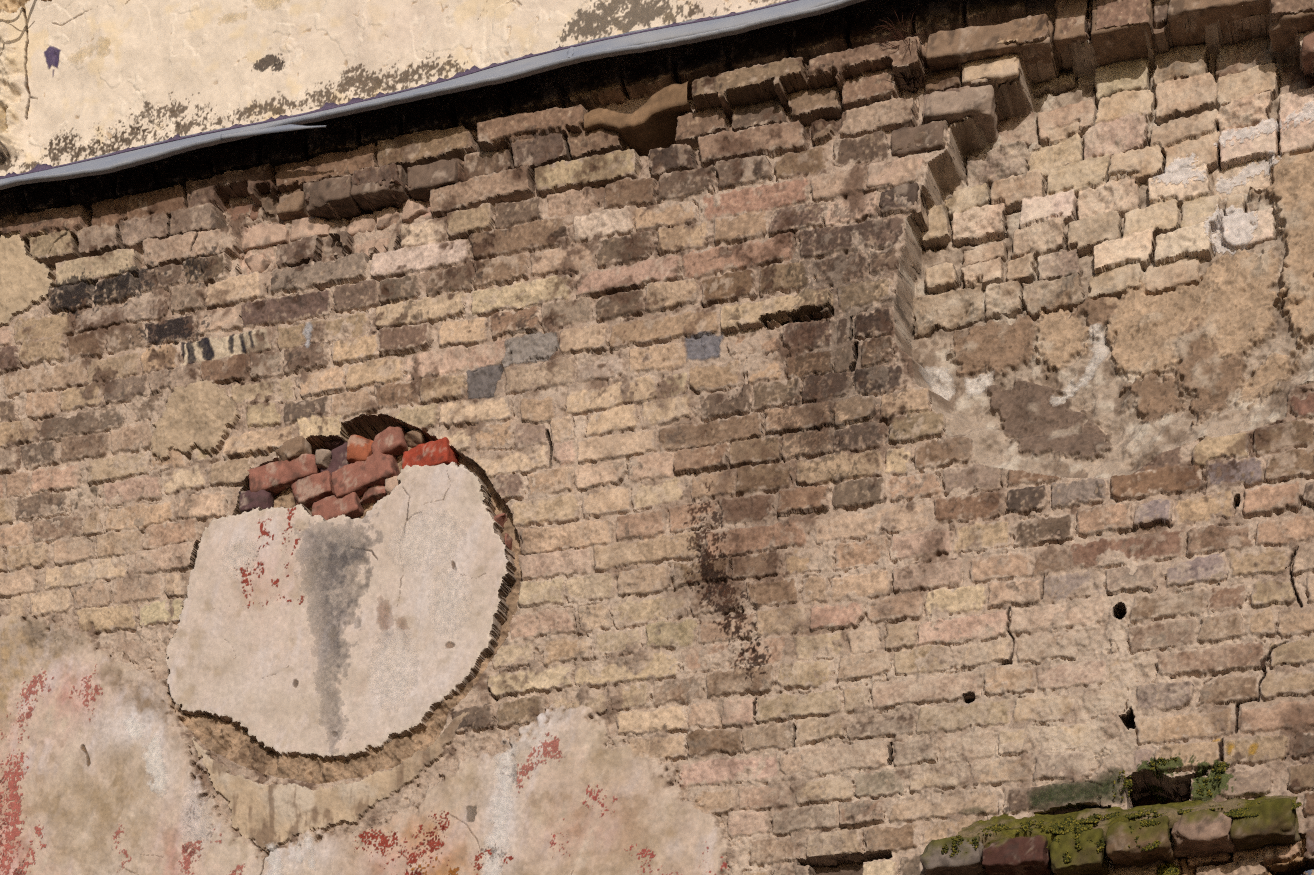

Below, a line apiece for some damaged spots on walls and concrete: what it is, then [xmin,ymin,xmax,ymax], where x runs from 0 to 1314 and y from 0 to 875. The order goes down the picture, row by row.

water stain [0,54,465,173]
spalling [219,177,434,275]
spalling [894,11,1314,478]
water stain [316,537,364,648]
spalling [1130,786,1191,808]
spalling [801,855,892,875]